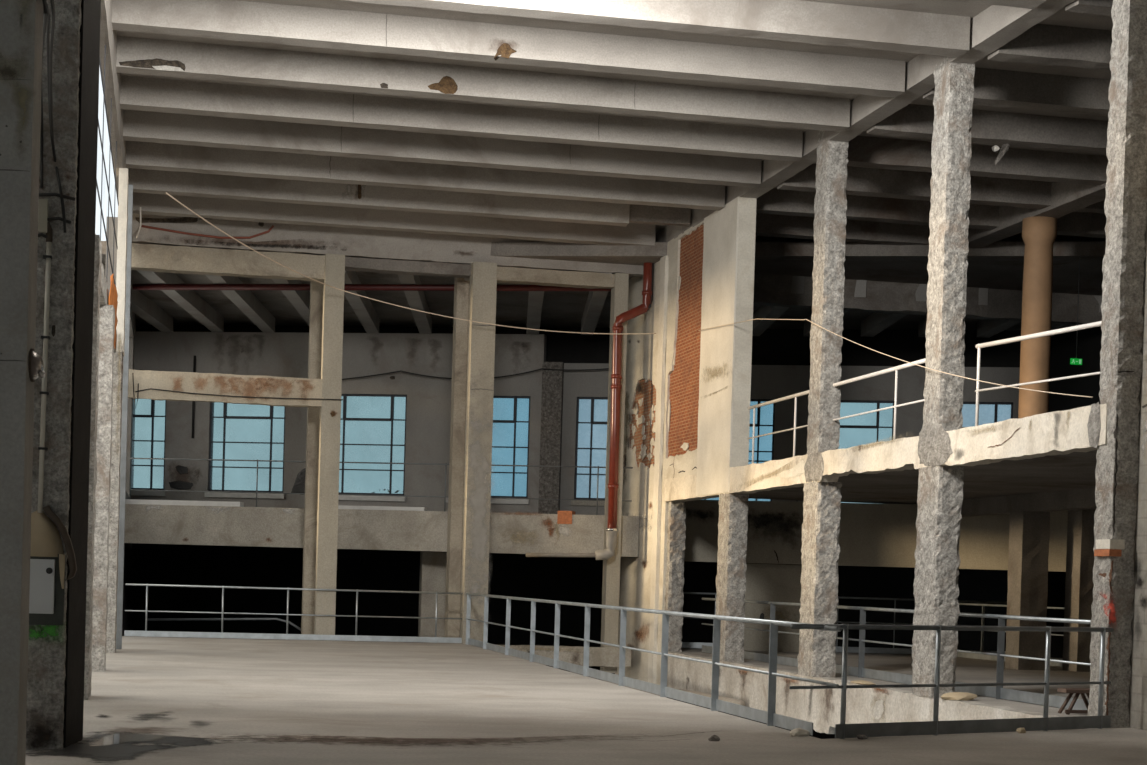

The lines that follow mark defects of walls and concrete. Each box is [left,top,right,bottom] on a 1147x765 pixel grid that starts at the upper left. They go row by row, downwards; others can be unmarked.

spalling [119,58,186,71]
spalling [428,76,458,94]
flaking render [629,204,704,468]